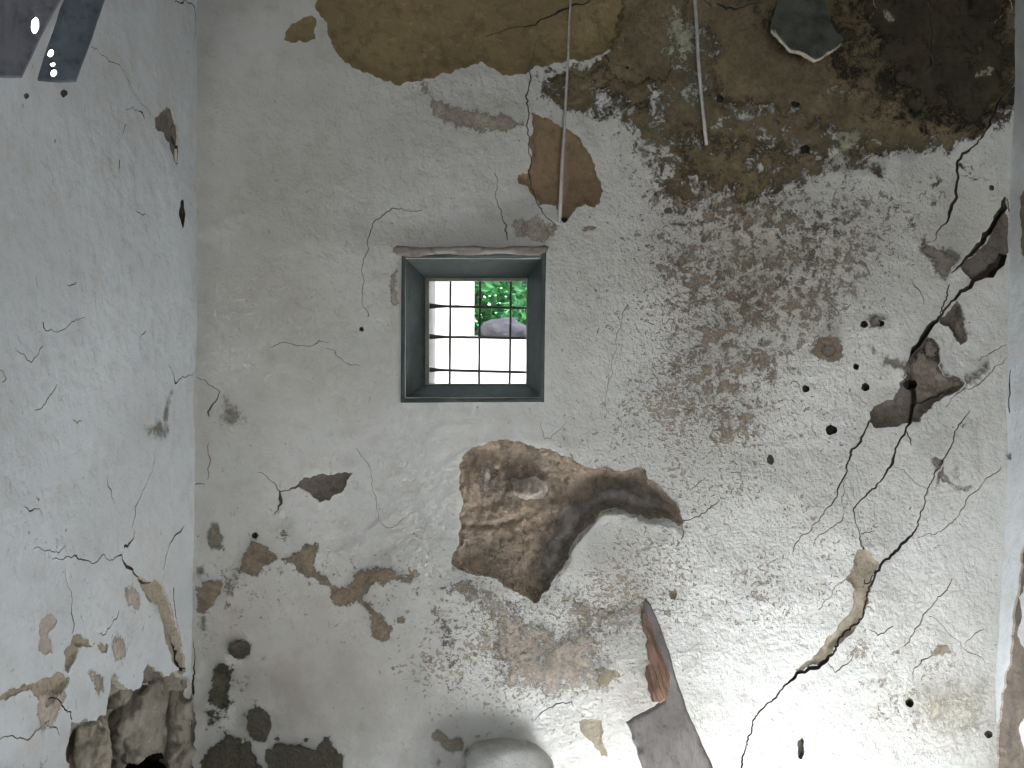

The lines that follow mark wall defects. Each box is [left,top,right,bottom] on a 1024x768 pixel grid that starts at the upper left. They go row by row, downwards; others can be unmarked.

spalling [284,0,626,223]
crack [486,0,591,227]
leakage [681,0,1015,156]
crack [34,458,195,726]
spalling [299,472,353,502]
peeling [281,542,420,642]
crack [361,208,422,316]
spalling [423,439,683,704]
peeling [635,190,895,452]
crack [741,345,1011,768]
spalling [869,337,960,428]
crack [910,197,1010,357]